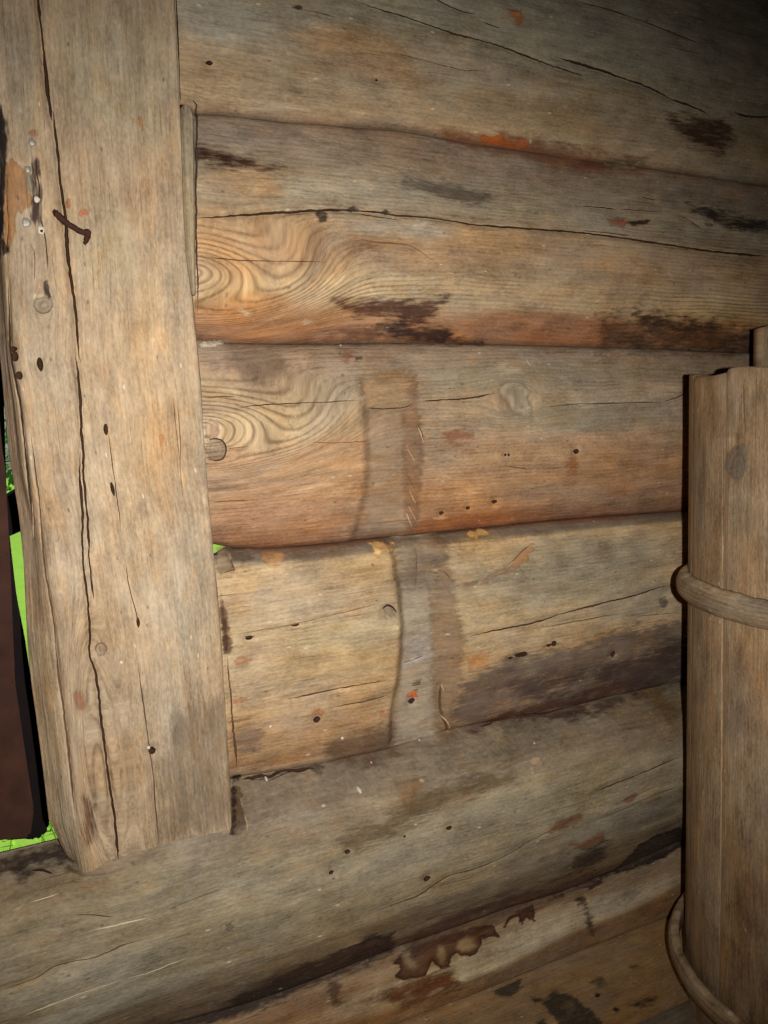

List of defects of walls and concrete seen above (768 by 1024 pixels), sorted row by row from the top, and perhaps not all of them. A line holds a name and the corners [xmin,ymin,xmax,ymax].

crack [301,0,709,114]
water stain [671,116,732,154]
crack [196,197,761,263]
water stain [331,295,484,344]
water stain [601,310,753,353]
crack [31,0,119,859]
crack [109,439,121,531]
crack [8,284,75,813]
crack [466,586,680,638]
water stain [160,828,683,1024]